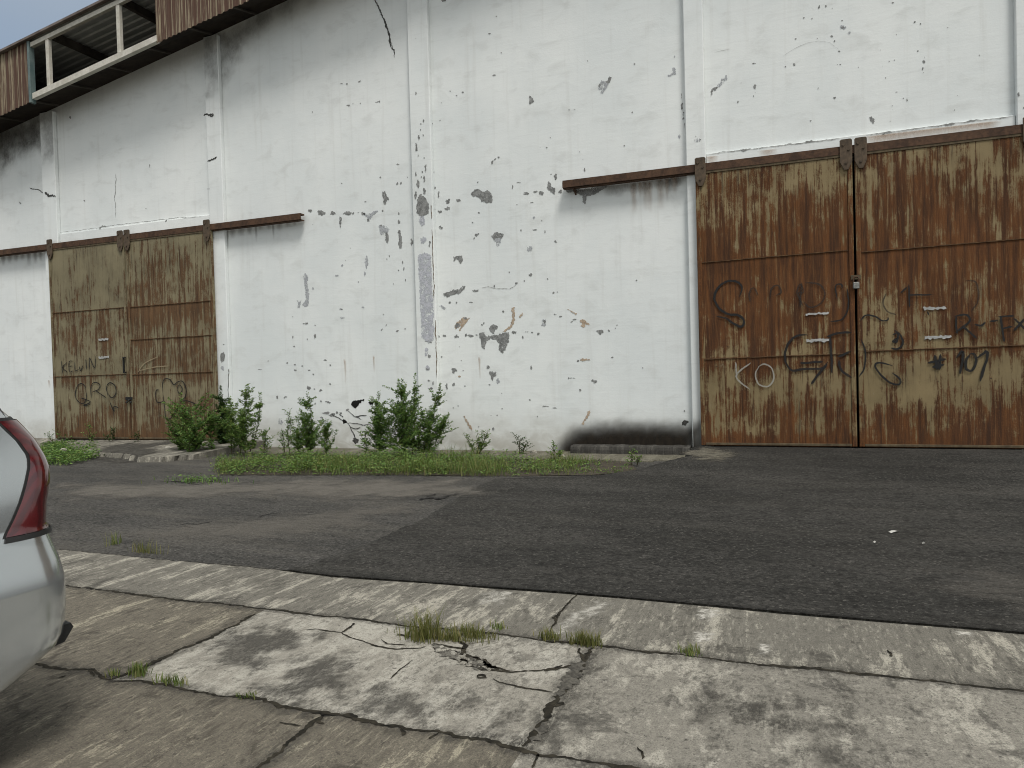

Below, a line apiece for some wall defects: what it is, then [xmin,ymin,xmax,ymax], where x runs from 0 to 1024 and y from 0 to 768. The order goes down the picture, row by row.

crack [375,0,395,55]
peeling [308,119,577,389]
peeling [512,174,609,205]
crack [35,585,1024,768]